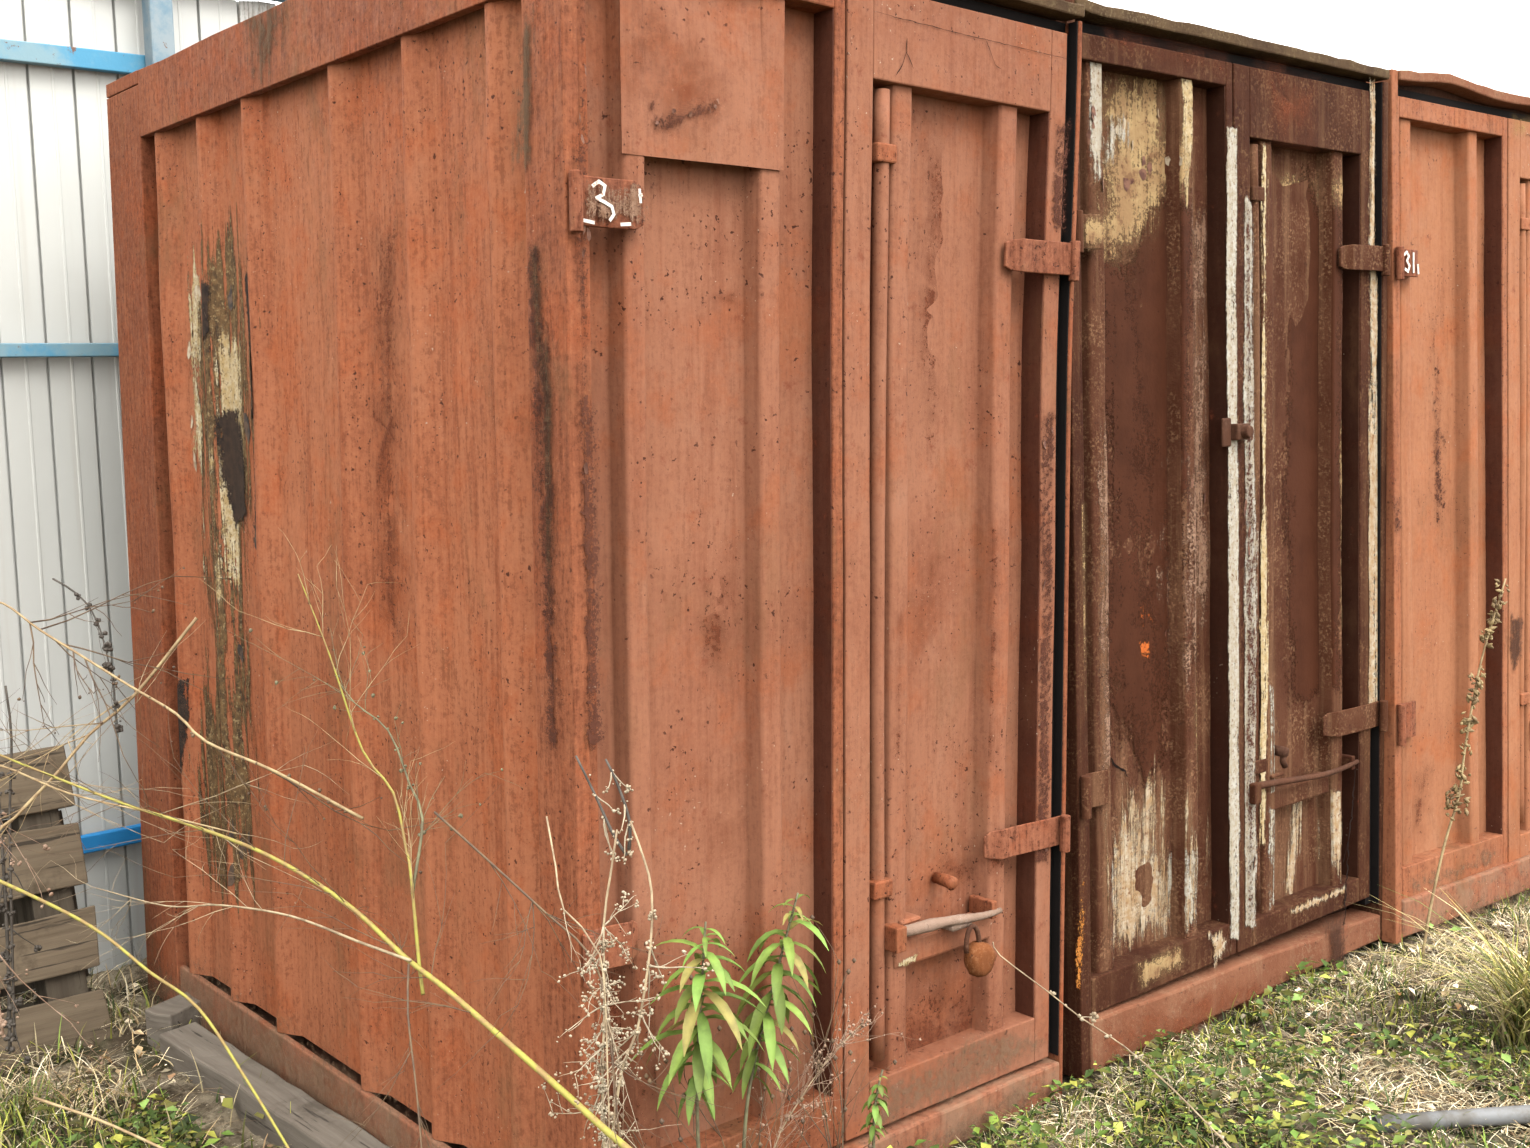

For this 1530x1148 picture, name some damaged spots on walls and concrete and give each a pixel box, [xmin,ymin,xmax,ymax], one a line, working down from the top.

peeling [177,203,261,919]
rust [525,239,562,749]
rust [575,226,606,751]
peeling [1085,62,1193,269]
rust [1099,194,1194,788]
peeling [1105,127,1345,987]
rust [1282,161,1343,711]
rust [1075,882,1086,988]